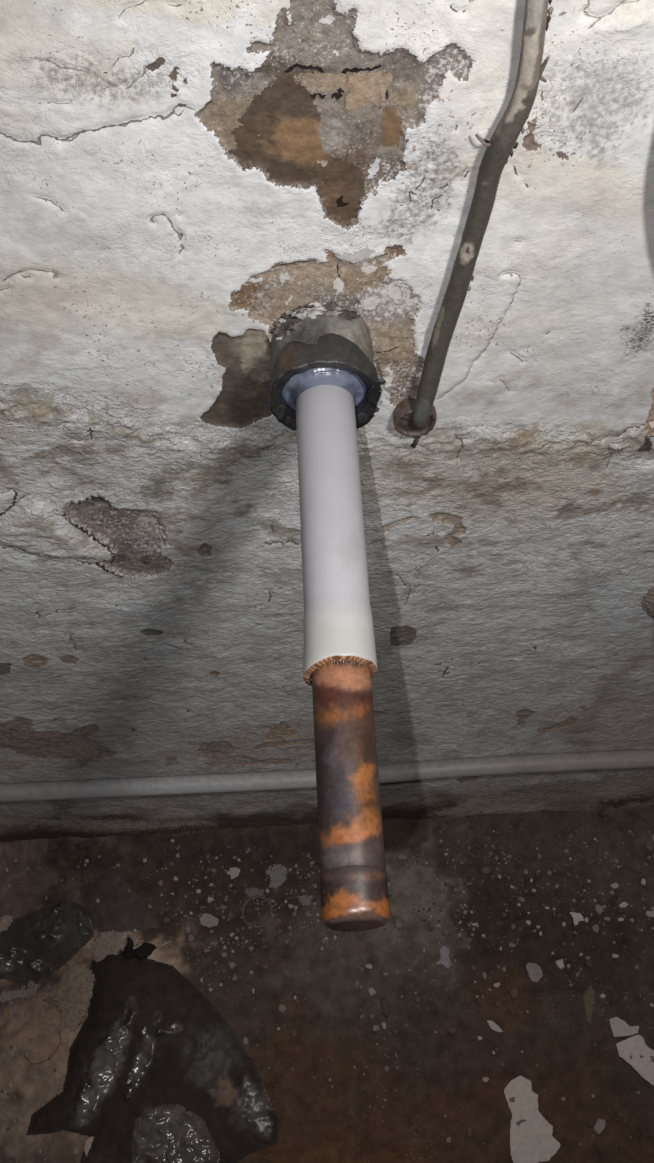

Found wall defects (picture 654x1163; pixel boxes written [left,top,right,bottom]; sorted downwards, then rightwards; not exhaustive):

crack [119,0,183,19]
crack [39,48,146,104]
crack [0,105,195,145]
peeling [145,0,475,230]
peeling [200,244,427,428]
peeling [643,388,654,438]
crack [0,489,31,516]
flaking render [55,495,173,579]